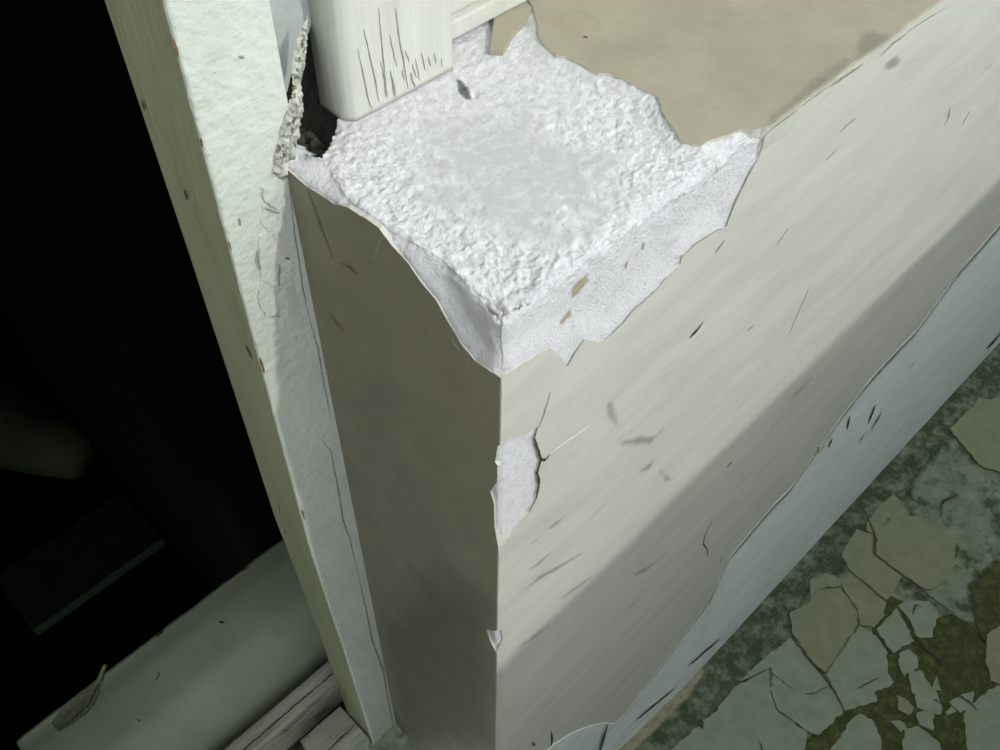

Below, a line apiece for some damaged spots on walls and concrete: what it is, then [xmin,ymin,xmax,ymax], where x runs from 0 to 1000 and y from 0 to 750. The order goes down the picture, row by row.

spalling [288,1,770,371]
crack [288,179,394,726]
spalling [492,430,539,541]
crack [529,392,551,512]
peeling [547,224,1000,750]
crack [950,396,1000,473]
crack [672,494,1000,750]